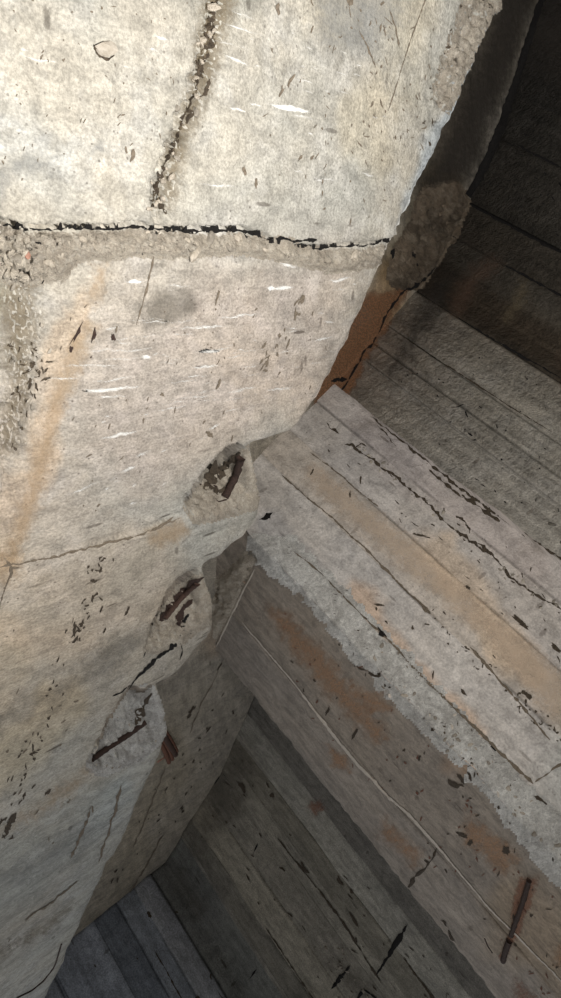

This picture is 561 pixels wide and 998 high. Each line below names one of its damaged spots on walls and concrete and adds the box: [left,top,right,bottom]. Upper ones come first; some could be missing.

crack [0,0,390,255]
spalling [0,179,471,451]
corrosion [314,290,406,403]
crack [327,416,561,609]
spalling [143,573,219,655]
spalling [85,683,167,778]
corrosion [157,731,179,765]
spalling [246,533,561,889]
crack [331,926,407,998]